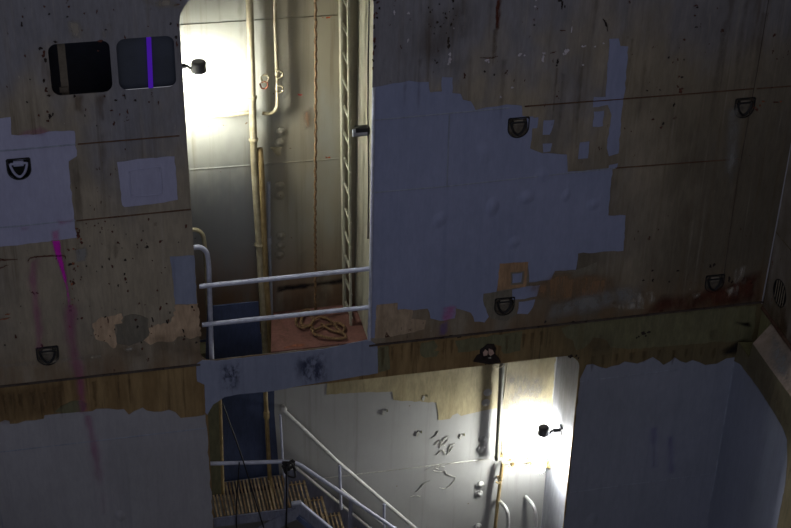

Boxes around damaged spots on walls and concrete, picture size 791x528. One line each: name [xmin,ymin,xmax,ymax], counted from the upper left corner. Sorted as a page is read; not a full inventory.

peeling [92,313,123,348]
peeling [144,303,201,345]